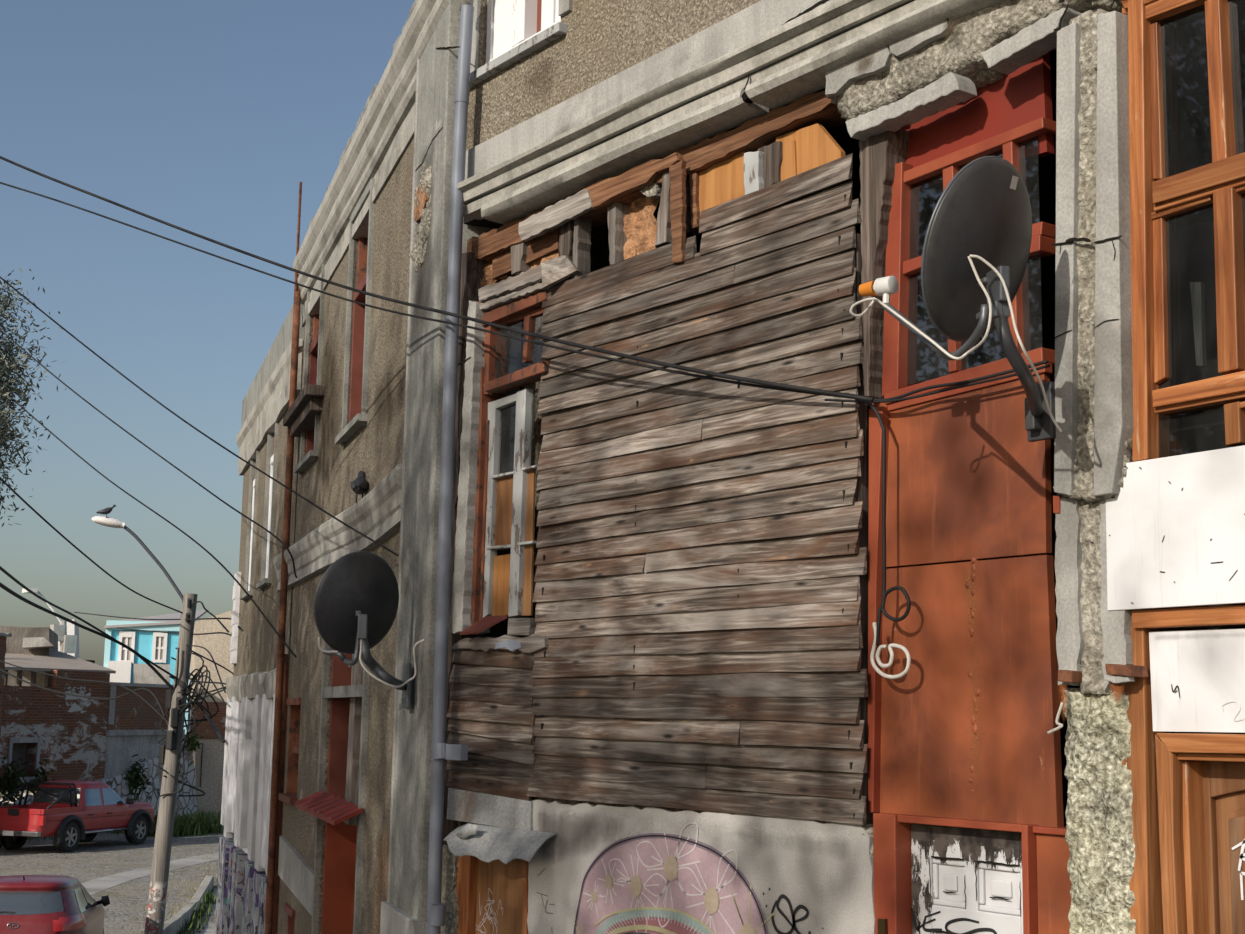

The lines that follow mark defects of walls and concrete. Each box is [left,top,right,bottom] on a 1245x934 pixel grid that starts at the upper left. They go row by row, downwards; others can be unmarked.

crack [1051,235,1122,258]
peeling [64,686,91,713]